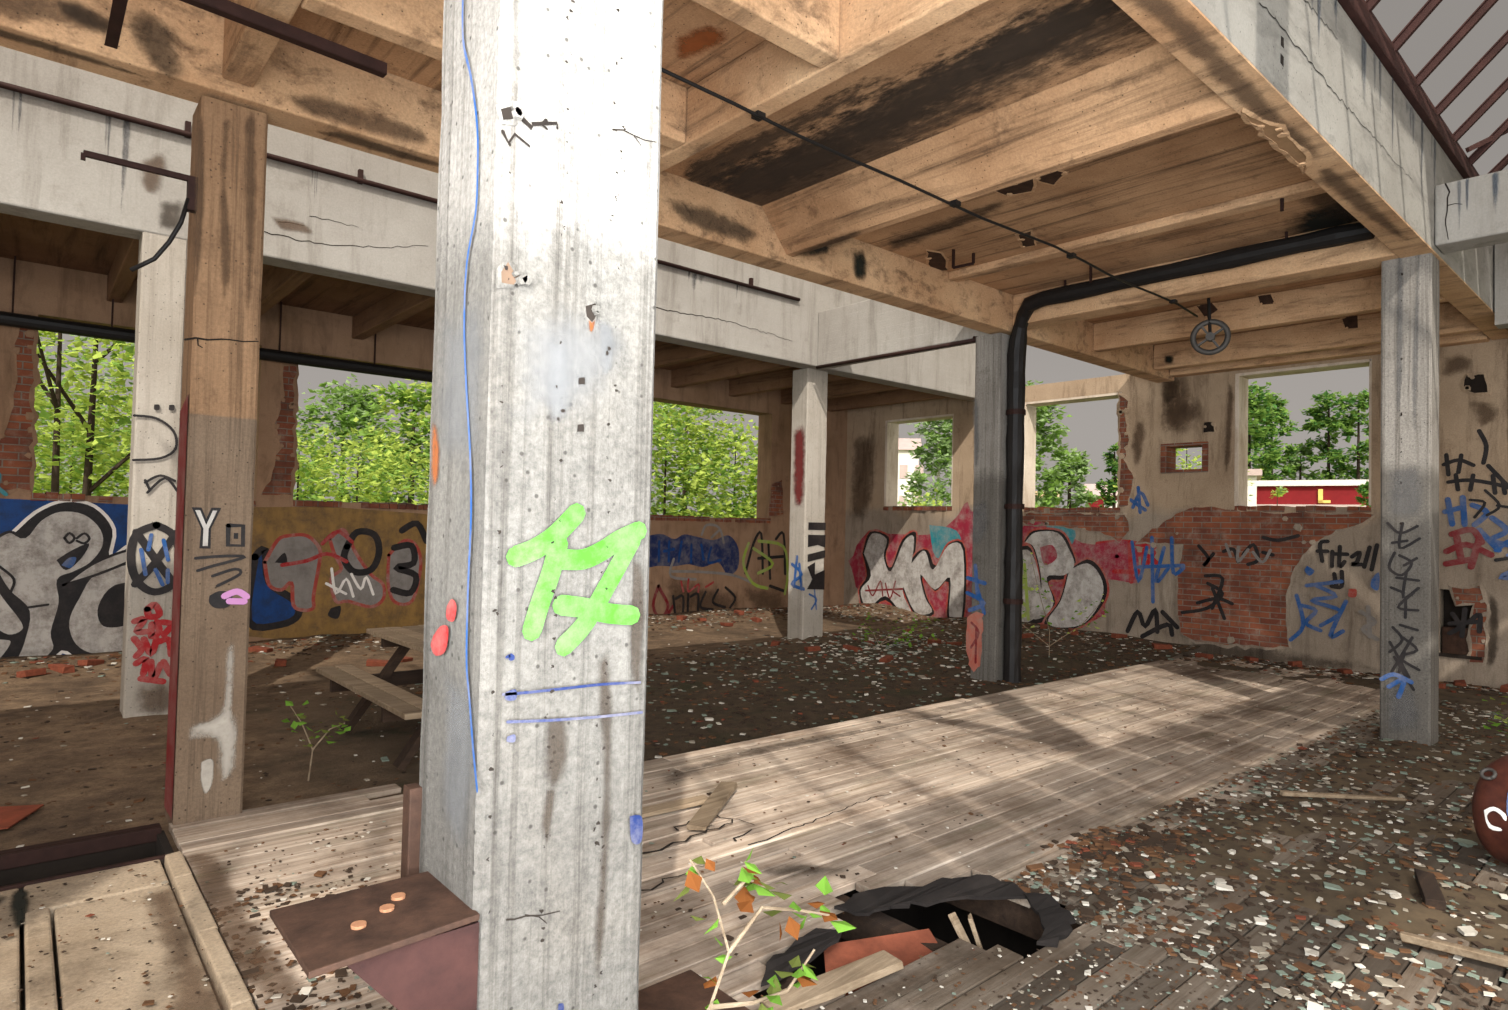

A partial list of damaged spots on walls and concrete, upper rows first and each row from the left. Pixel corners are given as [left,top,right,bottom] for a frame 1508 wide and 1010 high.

water stain [0,0,108,30]
water stain [0,30,125,71]
water stain [136,17,176,73]
water stain [297,99,438,165]
water stain [686,0,1307,206]
water stain [676,205,753,238]
water stain [1309,169,1399,233]
flaking render [0,327,41,496]
flaking render [259,363,299,500]
spalling [1459,372,1493,396]
flaking render [1023,392,1376,651]
spalling [1448,582,1491,667]